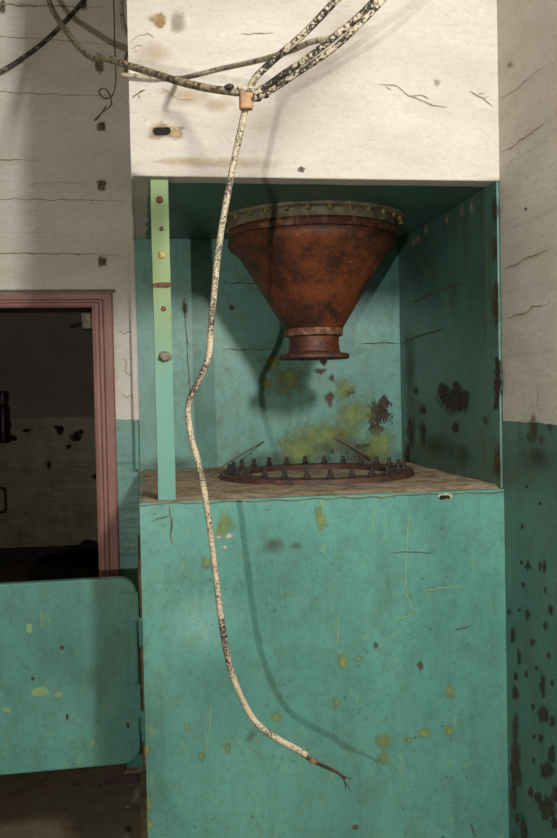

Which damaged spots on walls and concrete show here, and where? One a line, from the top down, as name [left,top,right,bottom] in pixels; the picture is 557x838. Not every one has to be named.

crack [0,2,99,10]
crack [0,33,152,53]
crack [0,88,197,100]
crack [1,182,122,201]
crack [0,250,122,258]
corrosion [493,356,503,410]
corrosion [510,715,520,810]